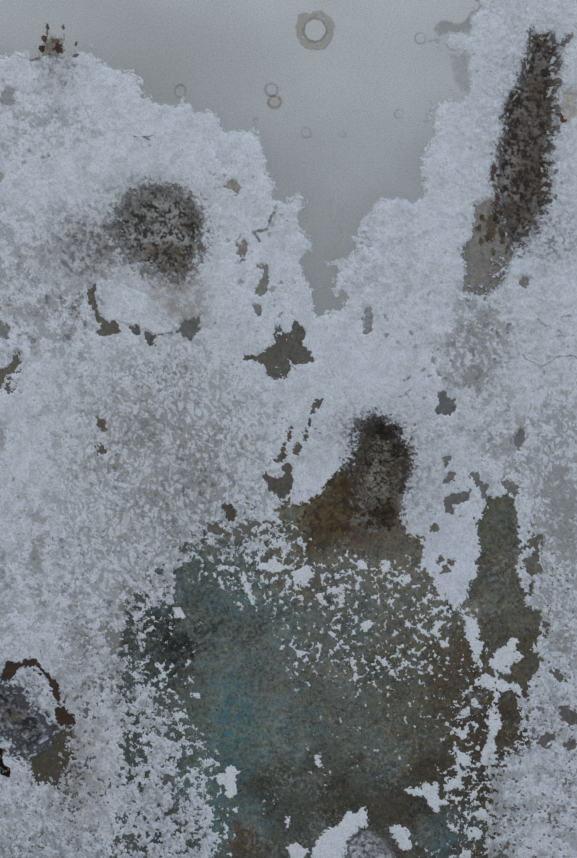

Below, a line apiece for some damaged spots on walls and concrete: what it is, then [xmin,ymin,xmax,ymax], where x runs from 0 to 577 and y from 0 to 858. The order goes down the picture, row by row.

corrosion [34,24,79,60]
damp [0,39,316,858]
corrosion [297,471,402,553]
damp [236,0,577,858]